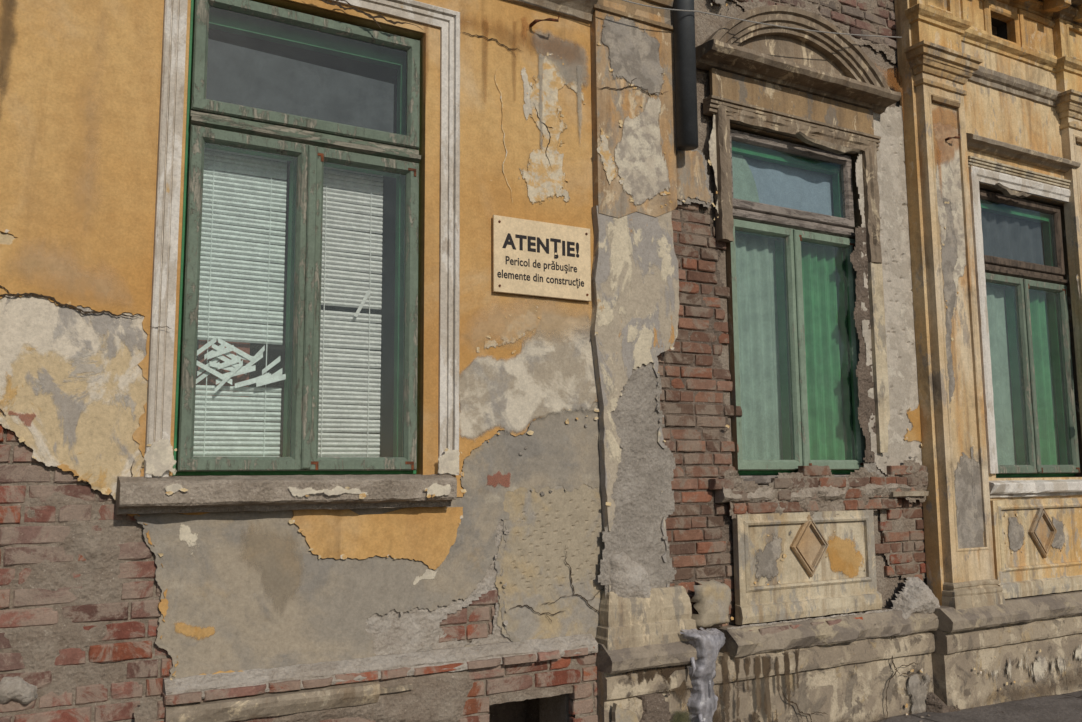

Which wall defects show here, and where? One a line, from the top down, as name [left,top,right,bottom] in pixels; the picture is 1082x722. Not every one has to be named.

peeling [519,53,585,205]
peeling [597,14,671,205]
crack [0,285,171,329]
peeling [0,106,928,722]